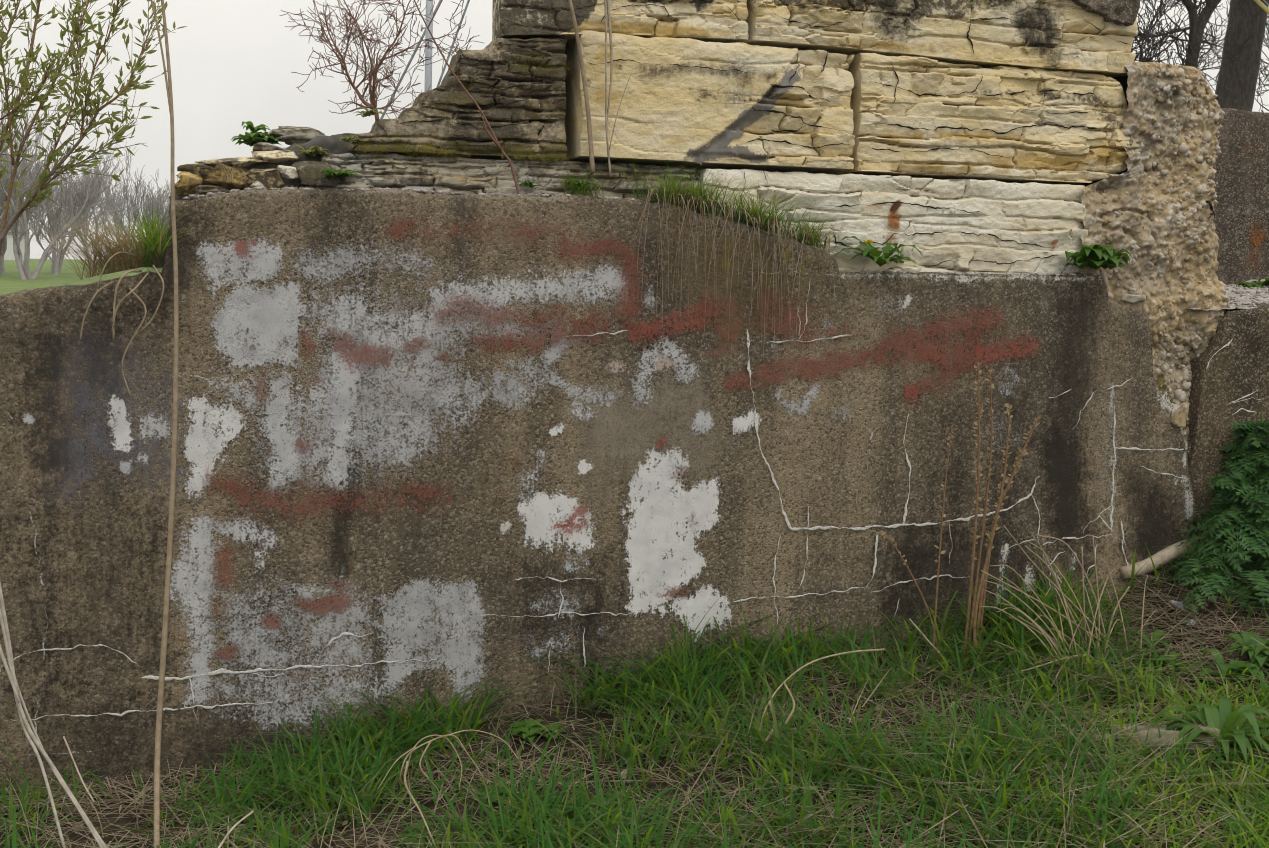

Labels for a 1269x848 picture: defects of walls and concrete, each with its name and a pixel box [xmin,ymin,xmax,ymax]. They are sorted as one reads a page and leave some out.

corrosion [888,200,902,242]
crack [828,202,1055,313]
spalling [1149,384,1180,412]
crack [1227,391,1264,414]
crack [734,271,1188,623]
spalling [1174,433,1195,519]
crack [0,511,436,756]